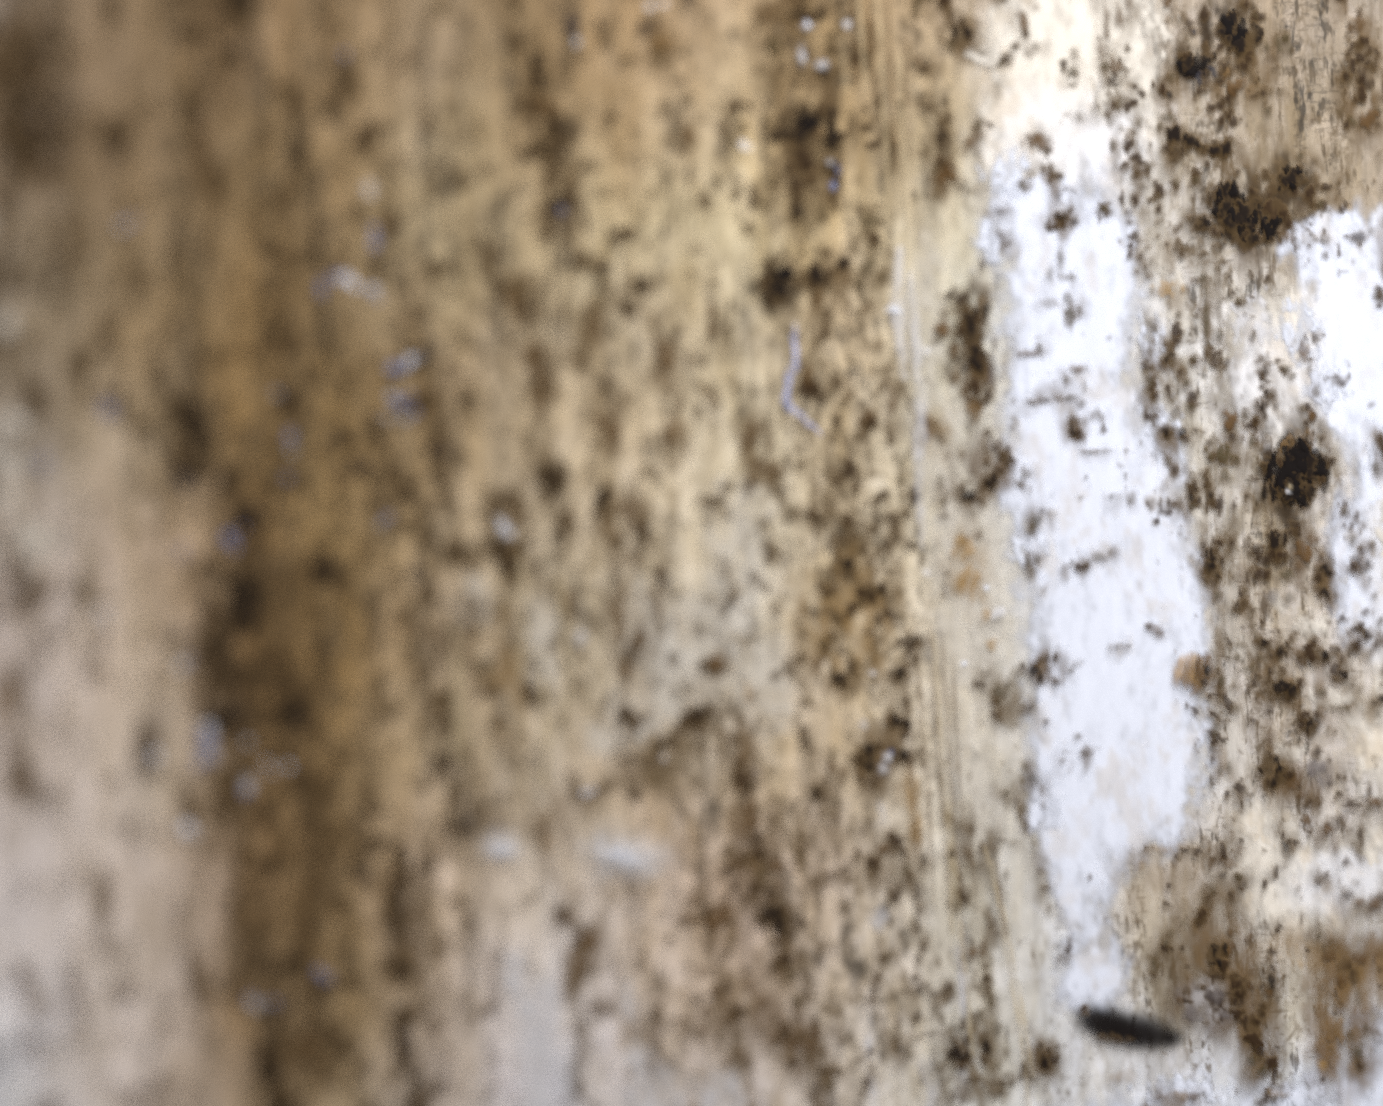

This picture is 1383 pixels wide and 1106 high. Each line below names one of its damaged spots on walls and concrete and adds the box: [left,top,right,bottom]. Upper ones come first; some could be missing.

water stain [938,0,985,56]
water stain [1001,12,1029,63]
water stain [736,38,897,230]
water stain [1027,133,1064,181]
water stain [1098,0,1348,305]
water stain [1045,208,1077,231]
water stain [759,231,881,335]
water stain [959,430,1024,506]
water stain [1069,420,1099,453]
water stain [1142,305,1383,851]
water stain [160,278,459,1106]
water stain [1021,651,1059,684]